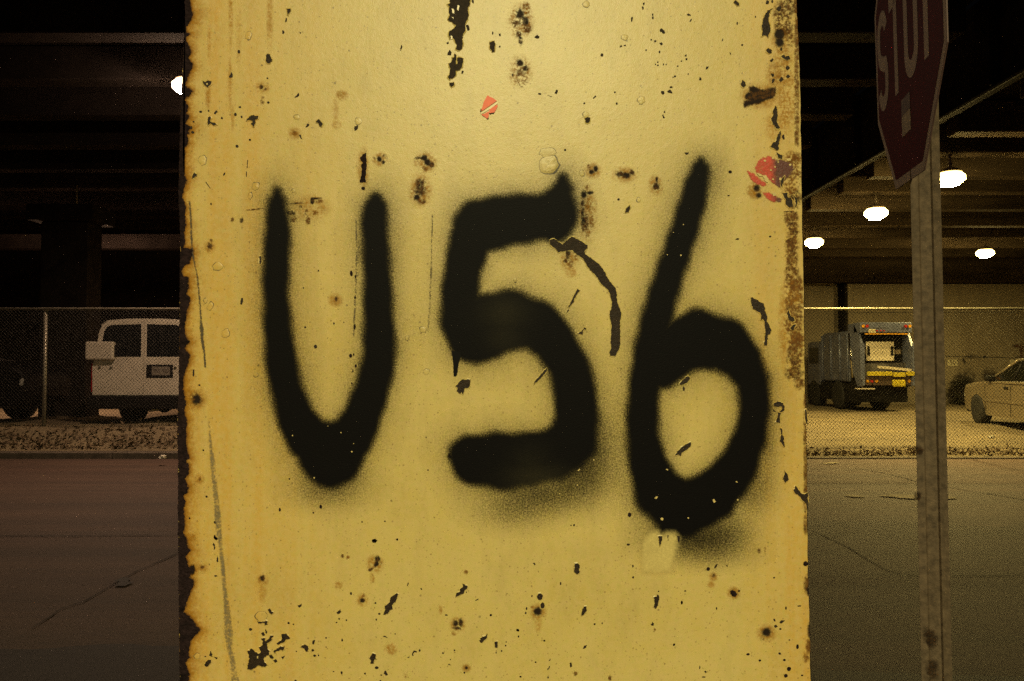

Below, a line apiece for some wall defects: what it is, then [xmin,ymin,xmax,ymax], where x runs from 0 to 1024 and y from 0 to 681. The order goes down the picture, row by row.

peeling [446,0,474,88]
corrosion [512,60,529,87]
corrosion [511,3,531,44]
peeling [747,105,799,212]
corrosion [744,0,806,406]
corrosion [177,0,213,681]
peeling [750,297,773,346]
peeling [247,608,327,671]